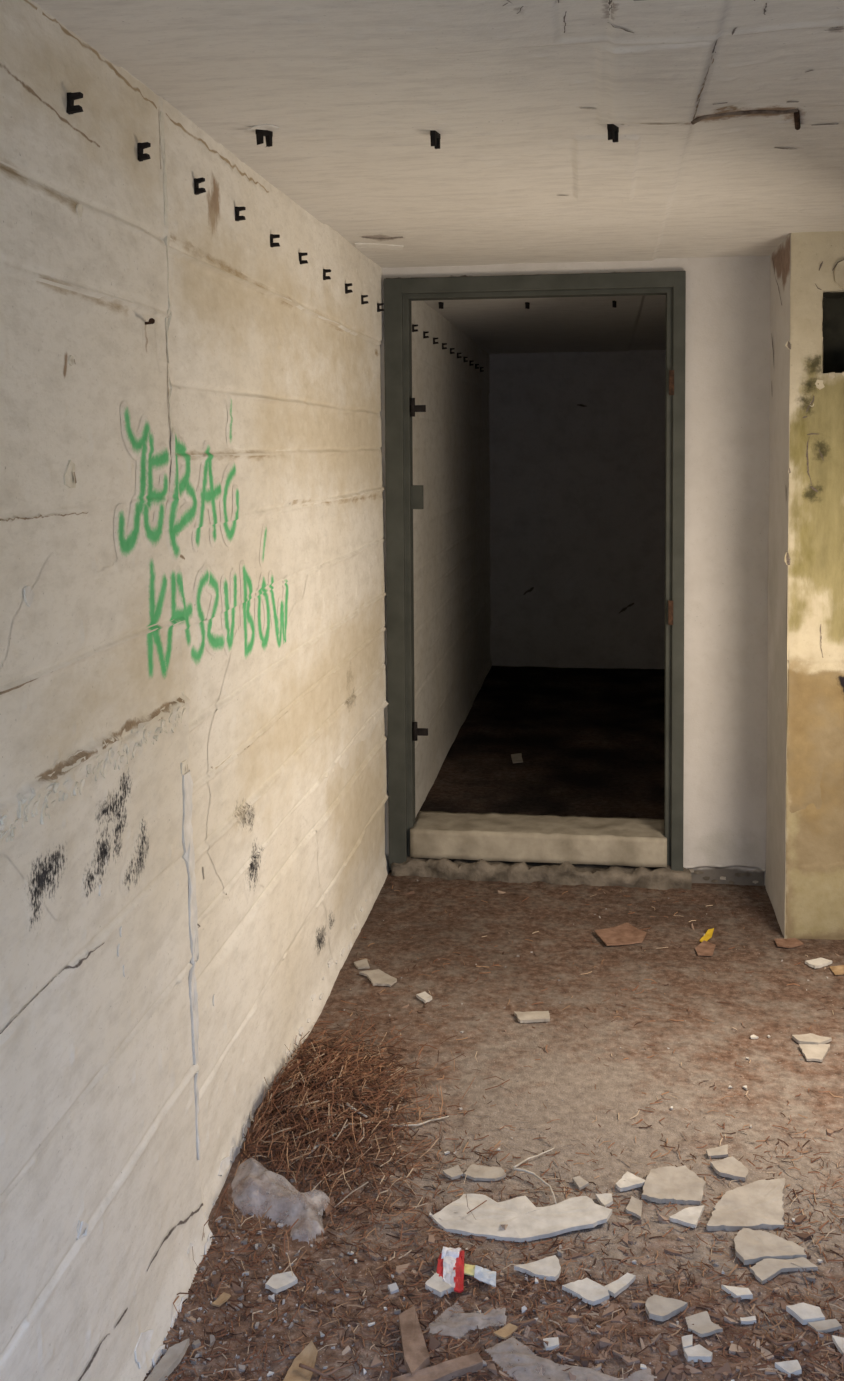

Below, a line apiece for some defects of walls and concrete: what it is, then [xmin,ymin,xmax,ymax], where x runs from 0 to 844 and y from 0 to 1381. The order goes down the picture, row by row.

crack [503,0,645,33]
crack [580,0,768,125]
crack [822,26,844,34]
crack [775,123,839,150]
spalling [811,372,844,407]
leakage [0,0,390,970]
leakage [683,337,844,937]
crack [147,1202,203,1272]
crack [77,1307,128,1381]